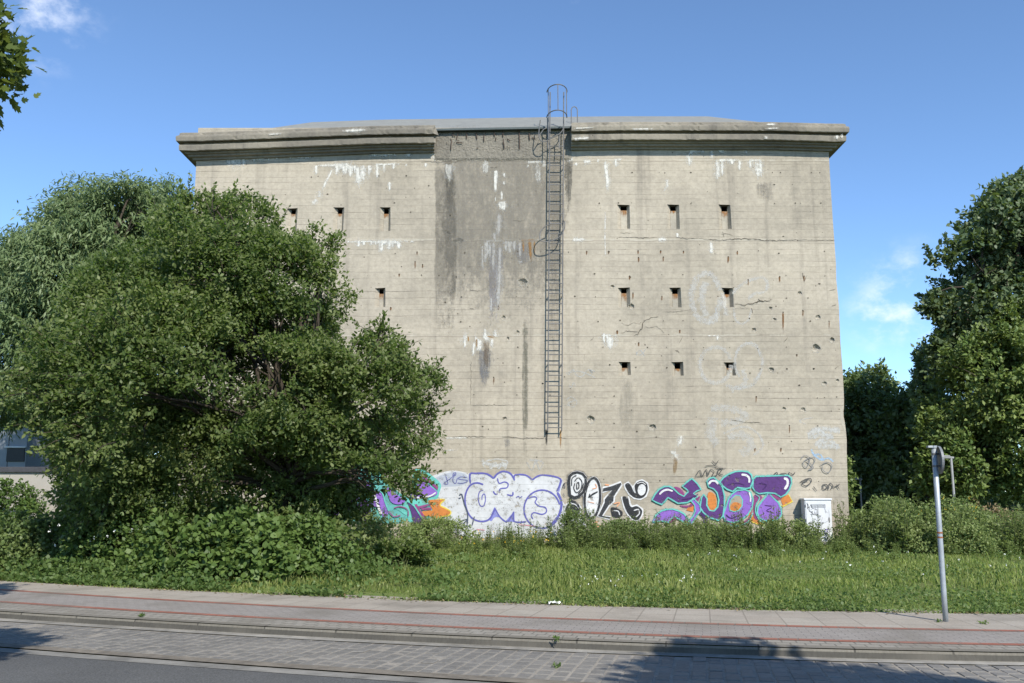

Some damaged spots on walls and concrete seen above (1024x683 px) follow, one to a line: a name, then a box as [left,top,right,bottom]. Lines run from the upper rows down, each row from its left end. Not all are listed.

damp [227,154,410,204]
damp [688,150,762,178]
damp [446,159,621,309]
damp [463,329,496,378]